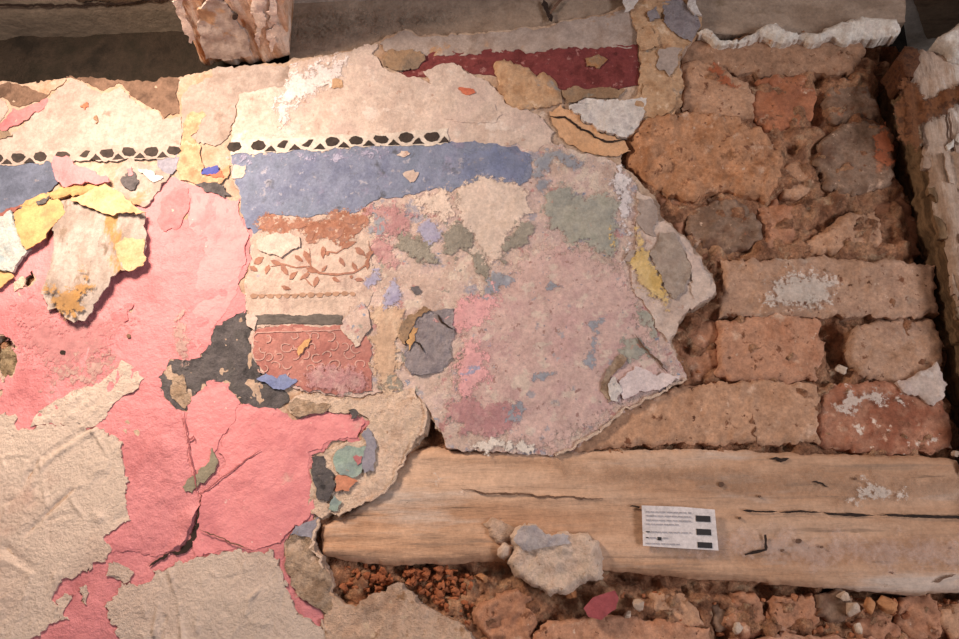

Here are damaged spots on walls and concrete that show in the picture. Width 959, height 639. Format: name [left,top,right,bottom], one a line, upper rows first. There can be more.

flaking render [687,0,702,16]
spalling [696,16,901,50]
spalling [624,191,716,342]
efflorescence [759,267,843,310]
peeling [0,0,647,639]
spalling [600,354,680,403]
efflorescence [835,390,910,416]
crack [149,412,260,567]